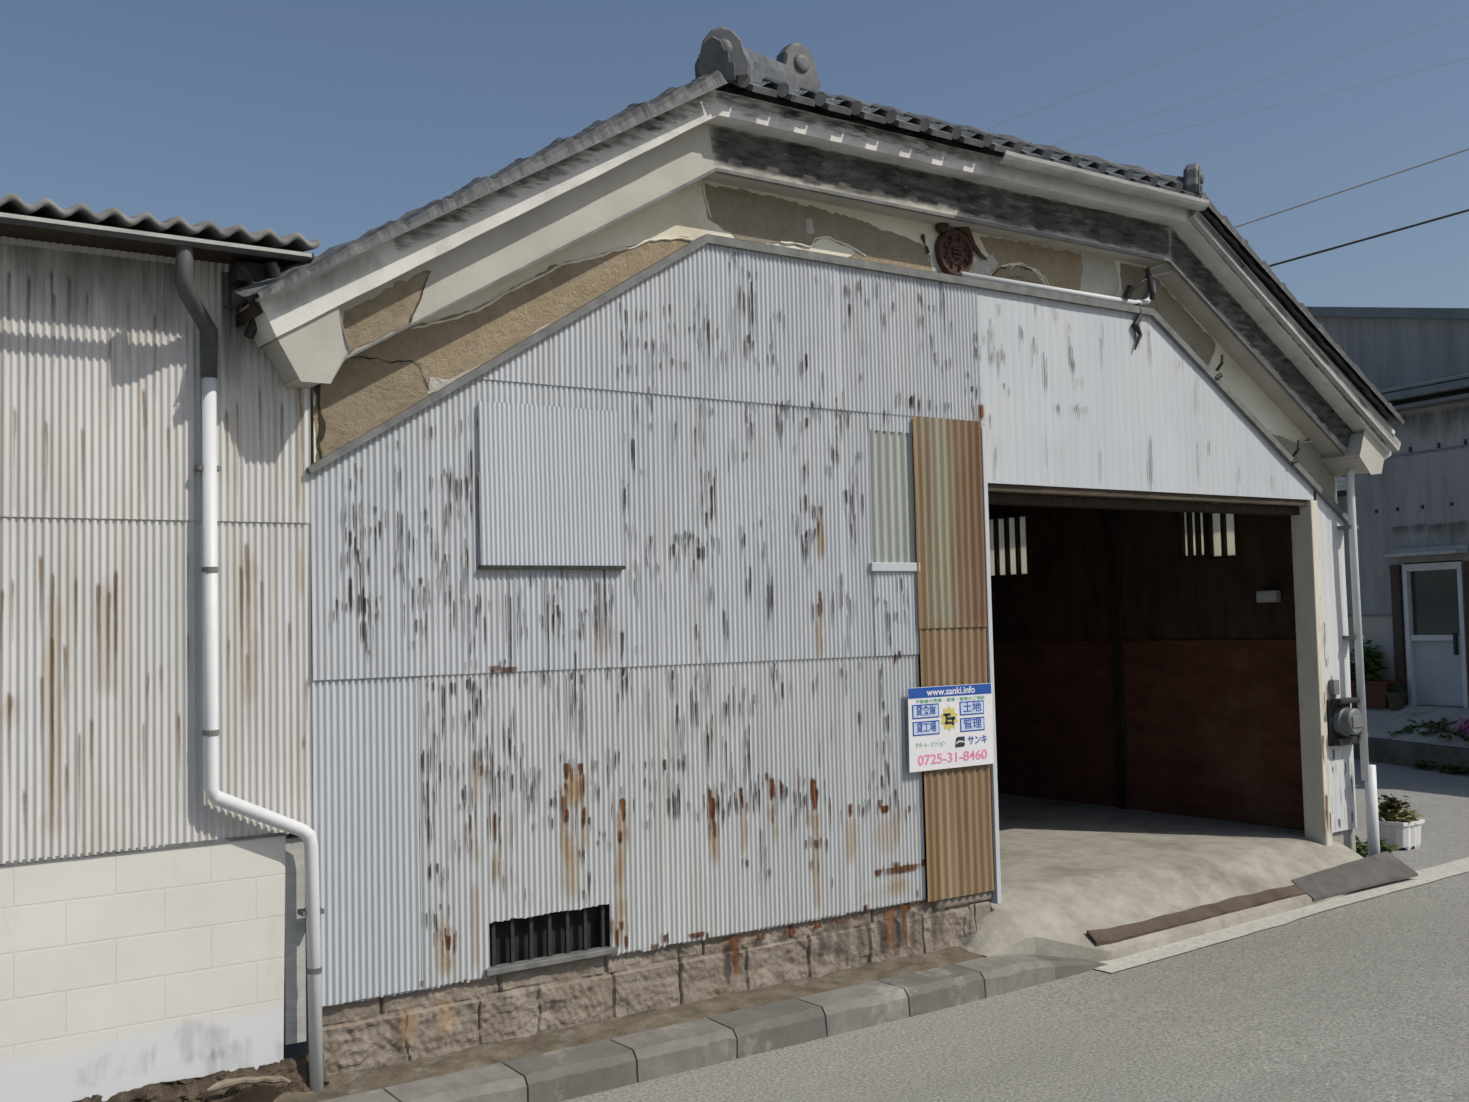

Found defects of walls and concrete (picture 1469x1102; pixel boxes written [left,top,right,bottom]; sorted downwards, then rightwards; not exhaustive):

flaking render [971,236,1082,291]
flaking render [313,184,952,544]
corrosion [97,572,118,647]
peeling [657,468,728,649]
peeling [742,534,773,628]
peeling [795,461,819,563]
corrosion [40,559,66,776]
peeling [864,664,896,811]
corrosion [555,761,595,833]
corrosion [703,787,749,836]
corrosion [762,770,911,851]
corrosion [875,859,927,876]